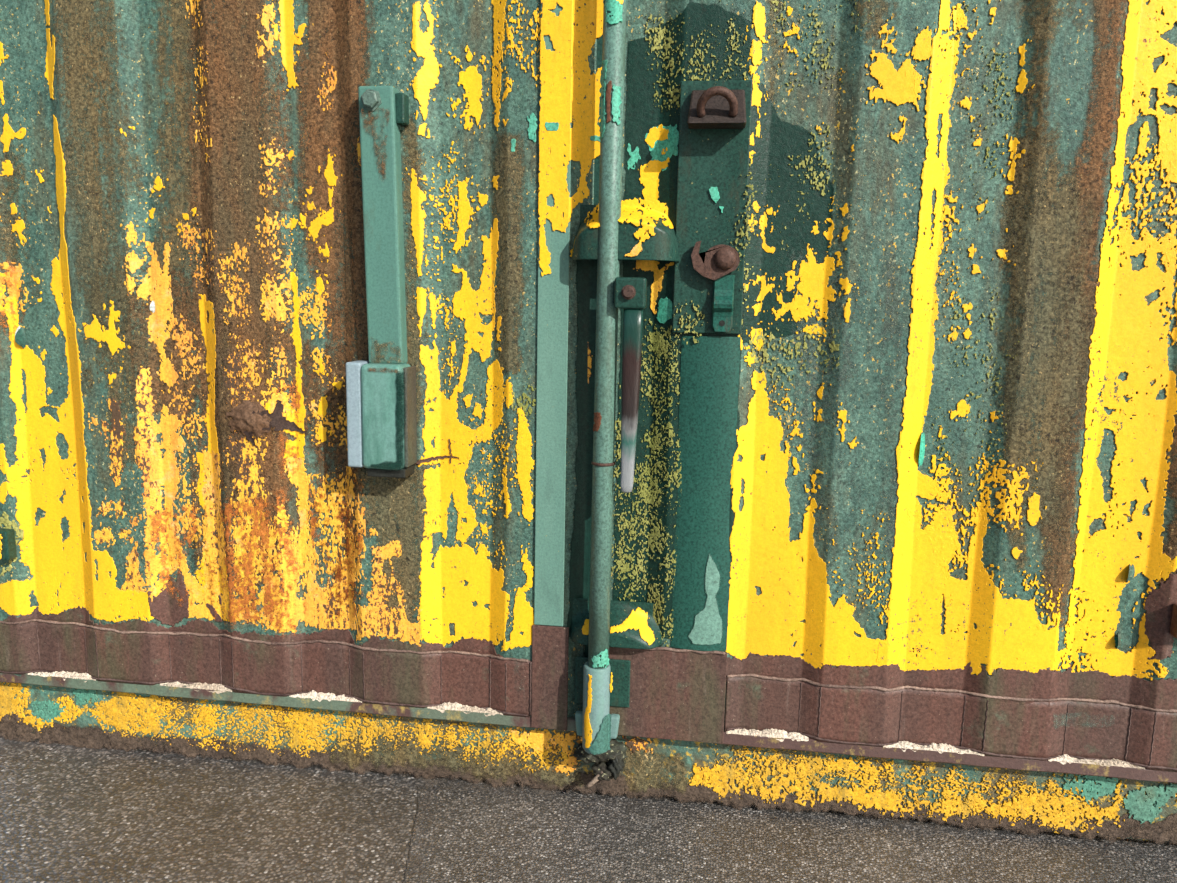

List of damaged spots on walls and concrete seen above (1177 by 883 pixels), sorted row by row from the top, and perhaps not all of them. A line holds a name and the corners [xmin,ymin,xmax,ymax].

corrosion [50,0,428,633]
peeling [0,0,624,651]
corrosion [492,130,528,374]
peeling [610,0,1177,681]
corrosion [996,0,1129,627]
peeling [0,649,653,776]
peeling [689,743,1177,833]